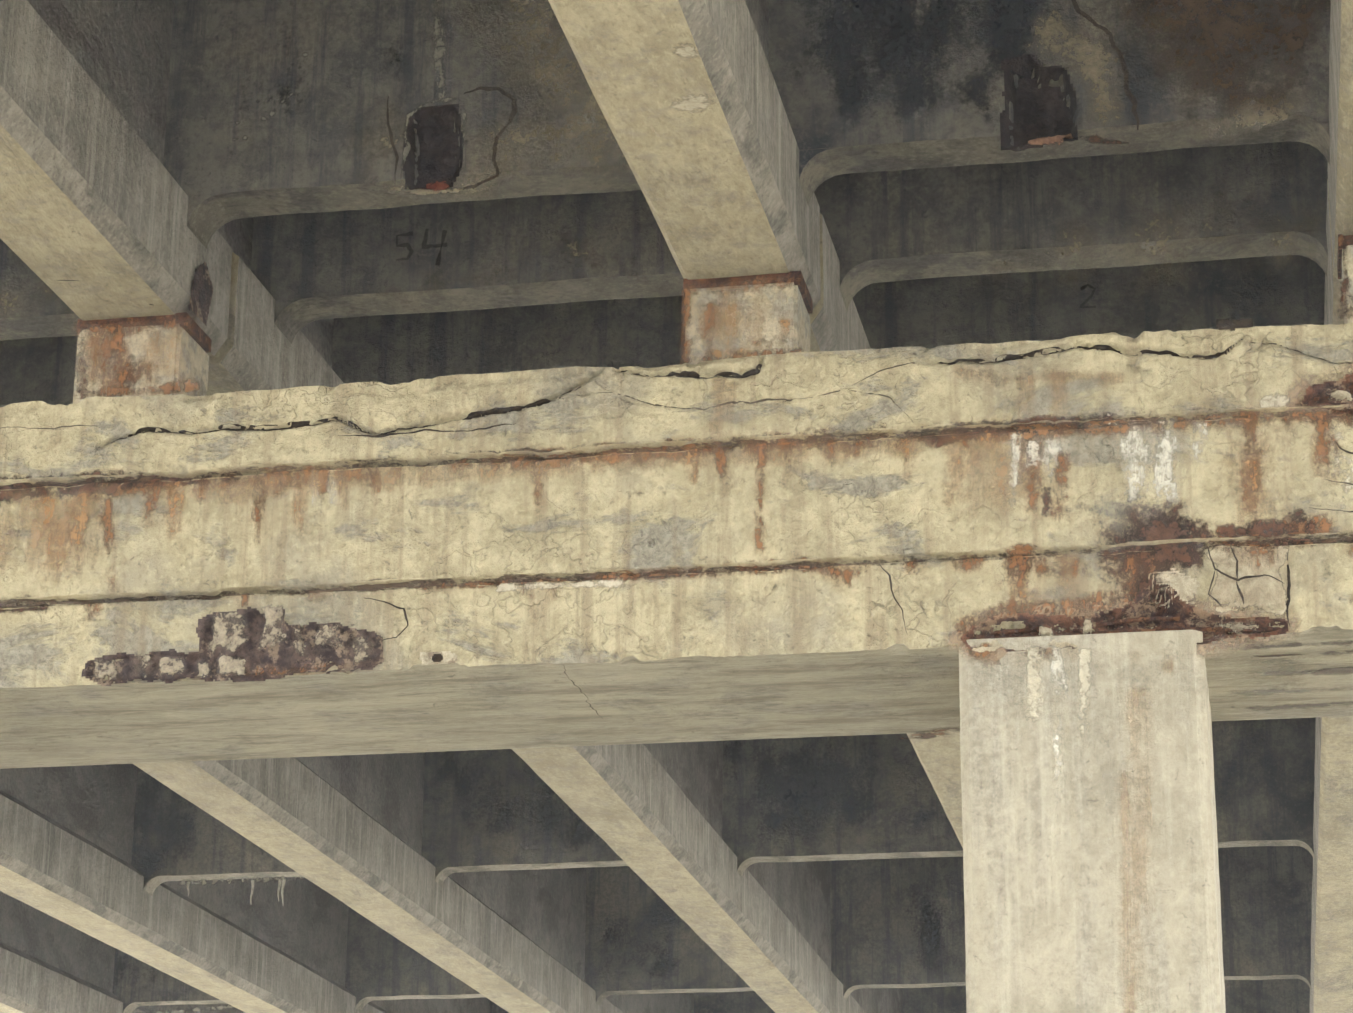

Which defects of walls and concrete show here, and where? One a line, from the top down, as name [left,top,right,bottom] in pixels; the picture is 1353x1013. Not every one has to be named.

water stain [806,0,1047,133]
spalling [1000,0,1139,152]
spalling [386,98,466,196]
crack [456,86,517,189]
corrosion [75,318,199,399]
corrosion [0,464,434,565]
crack [2,339,1352,443]
corrosion [680,277,804,365]
corrosion [422,373,1334,611]
spalling [1260,364,1353,494]
crack [1313,434,1353,513]
spalling [81,605,384,686]